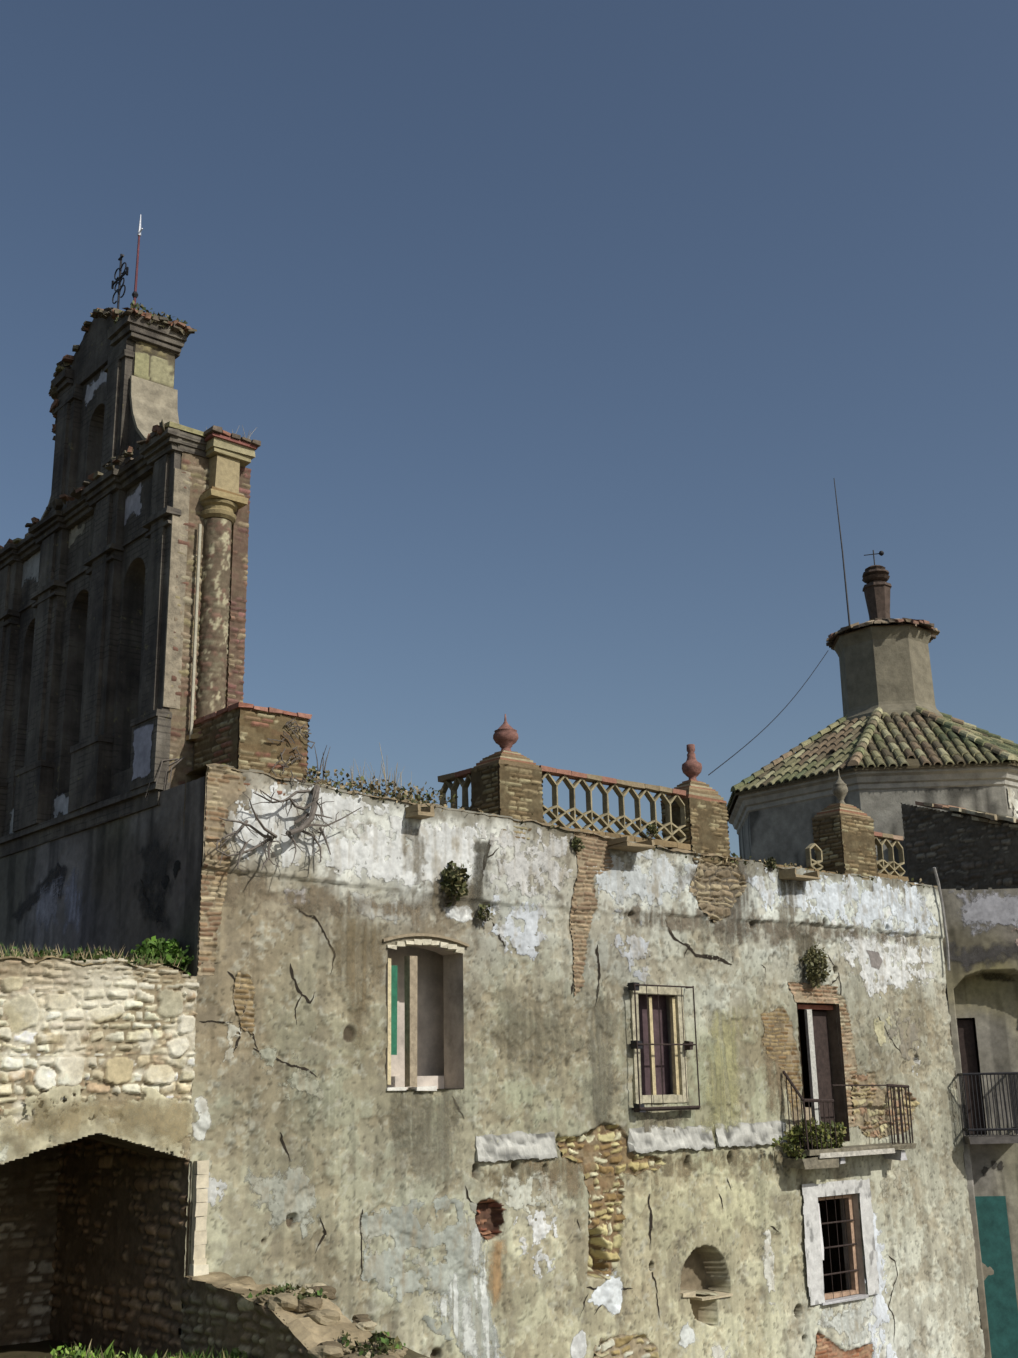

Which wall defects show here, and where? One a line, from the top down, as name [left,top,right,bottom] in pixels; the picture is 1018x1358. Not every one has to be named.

peeling [197,766,940,1001]
peeling [192,1096,211,1141]
spalling [223,971,255,1062]
crack [199,962,317,1077]
peeling [253,1047,324,1101]
crack [290,907,336,1022]
spalling [761,982,922,1140]
peeling [475,1170,563,1279]
spalling [555,1124,666,1315]
spalling [570,1330,659,1358]
peeling [679,1322,695,1348]
peeling [814,1213,898,1358]